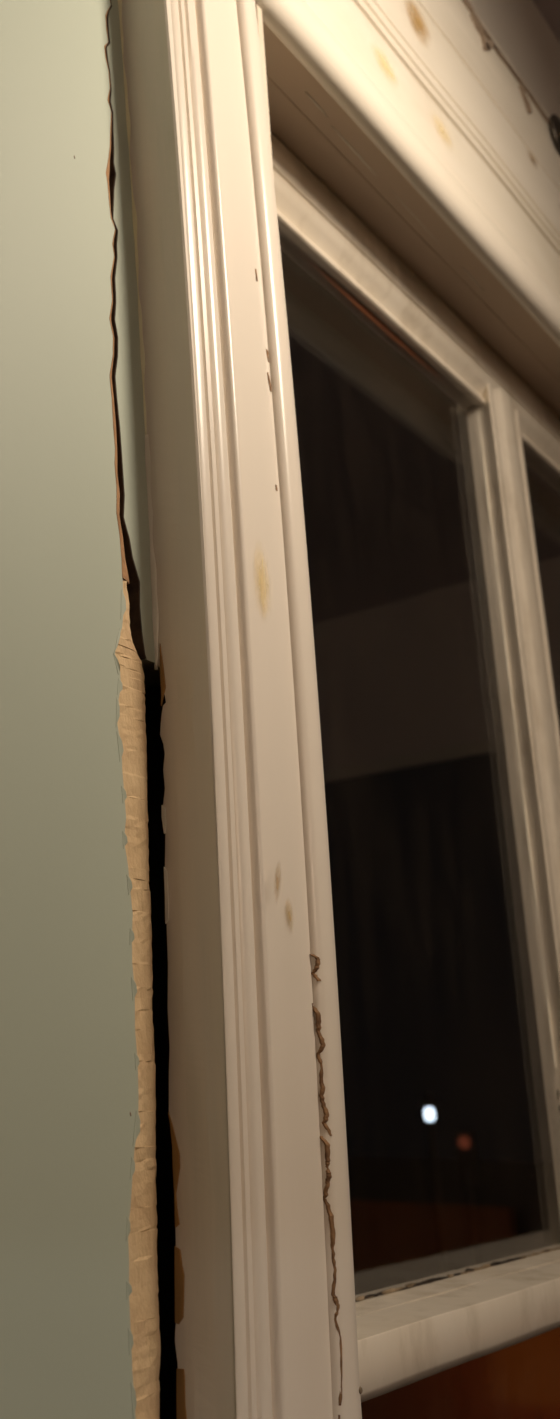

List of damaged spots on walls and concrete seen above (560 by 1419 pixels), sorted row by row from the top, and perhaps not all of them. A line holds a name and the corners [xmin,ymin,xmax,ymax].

crack [104,0,147,660]
crack [265,349,273,392]
flaking render [113,580,187,1419]
crack [309,954,343,1419]